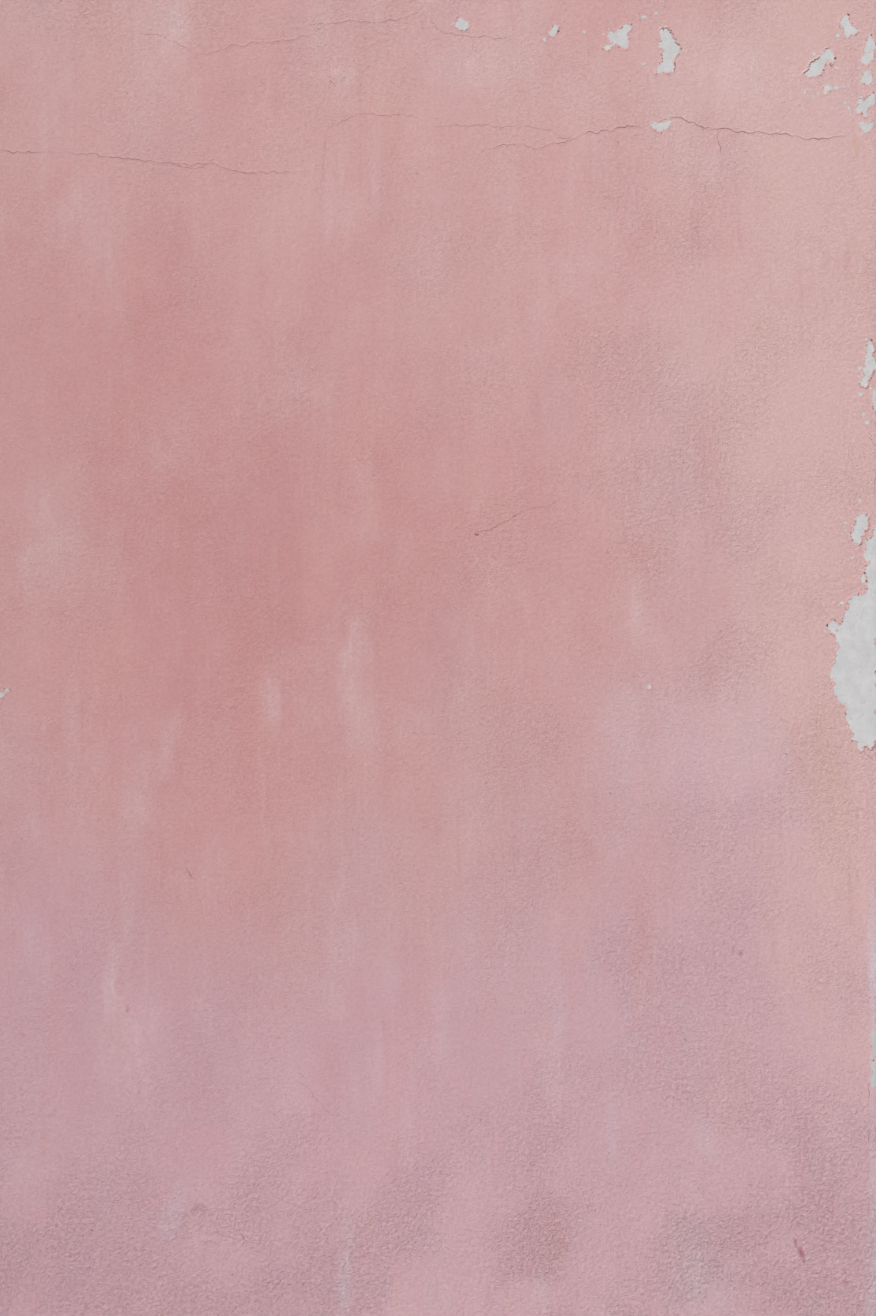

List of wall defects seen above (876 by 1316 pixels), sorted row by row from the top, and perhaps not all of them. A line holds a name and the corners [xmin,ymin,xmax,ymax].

peeling [601,12,687,76]
peeling [801,12,876,135]
crack [0,113,854,181]
peeling [857,338,876,425]
peeling [824,499,876,754]